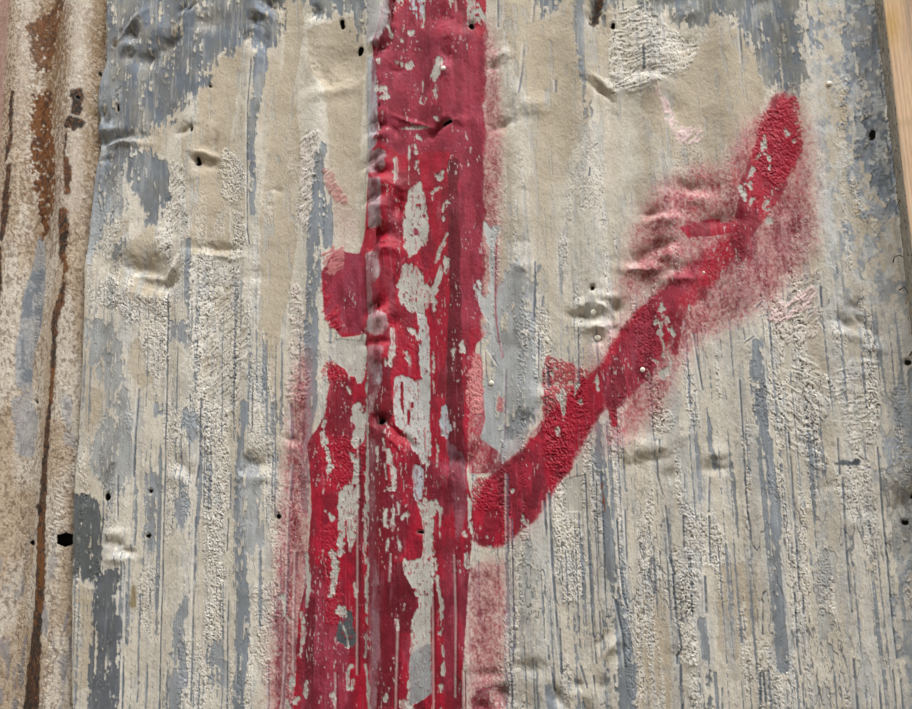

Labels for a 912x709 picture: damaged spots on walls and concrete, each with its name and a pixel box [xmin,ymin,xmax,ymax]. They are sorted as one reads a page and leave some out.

corrosion [25,0,65,74]
peeling [285,0,384,38]
peeling [386,0,427,43]
peeling [419,55,445,106]
peeling [15,0,250,393]
corrosion [23,87,87,709]
peeling [303,116,453,709]
peeling [555,381,583,437]
peeling [59,317,193,709]
peeling [462,479,478,538]
peeling [205,482,265,709]
peeling [278,552,313,658]